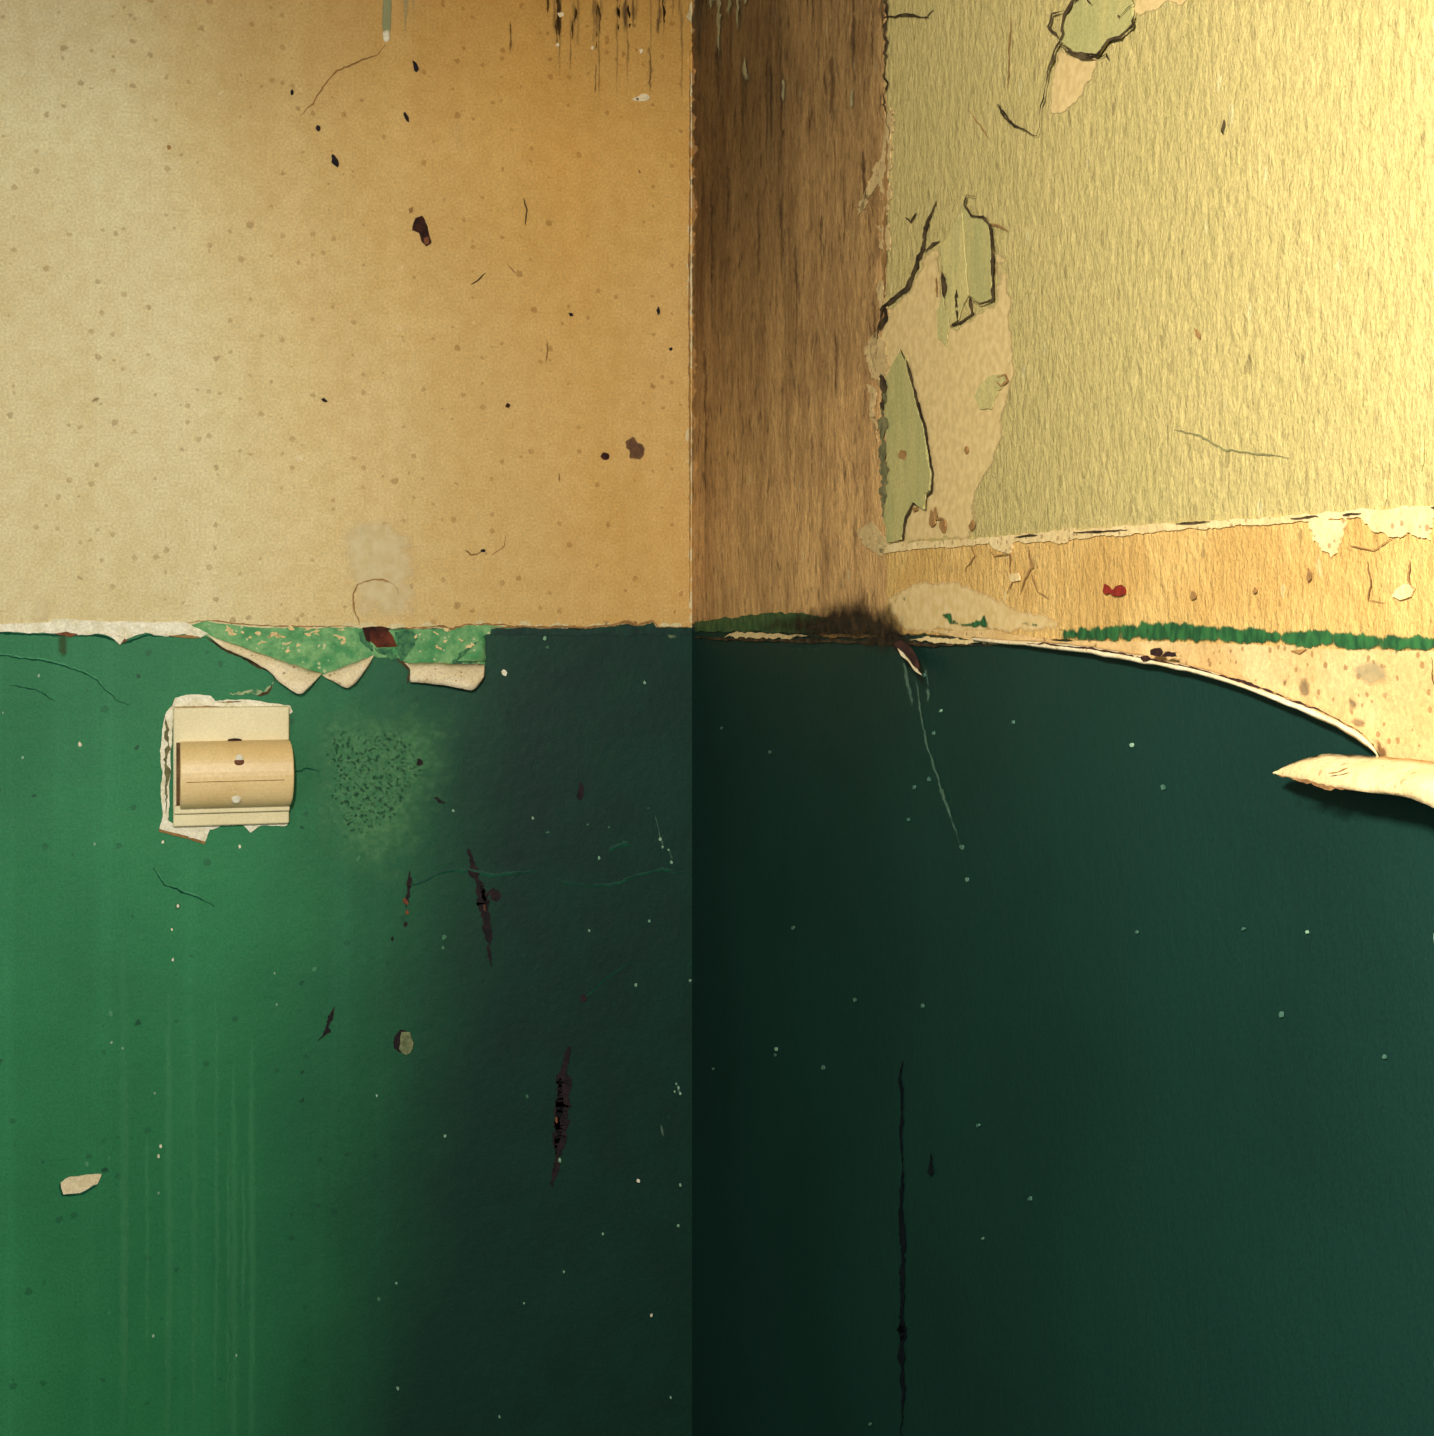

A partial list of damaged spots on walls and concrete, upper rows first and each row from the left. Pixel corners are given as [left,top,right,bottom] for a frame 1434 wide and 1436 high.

peeling [856,0,1434,558]
leakage [777,599,905,647]
peeling [0,581,1434,844]
leakage [327,731,421,833]
spalling [391,871,412,941]
peeling [59,1174,102,1196]
crack [896,1061,907,1436]